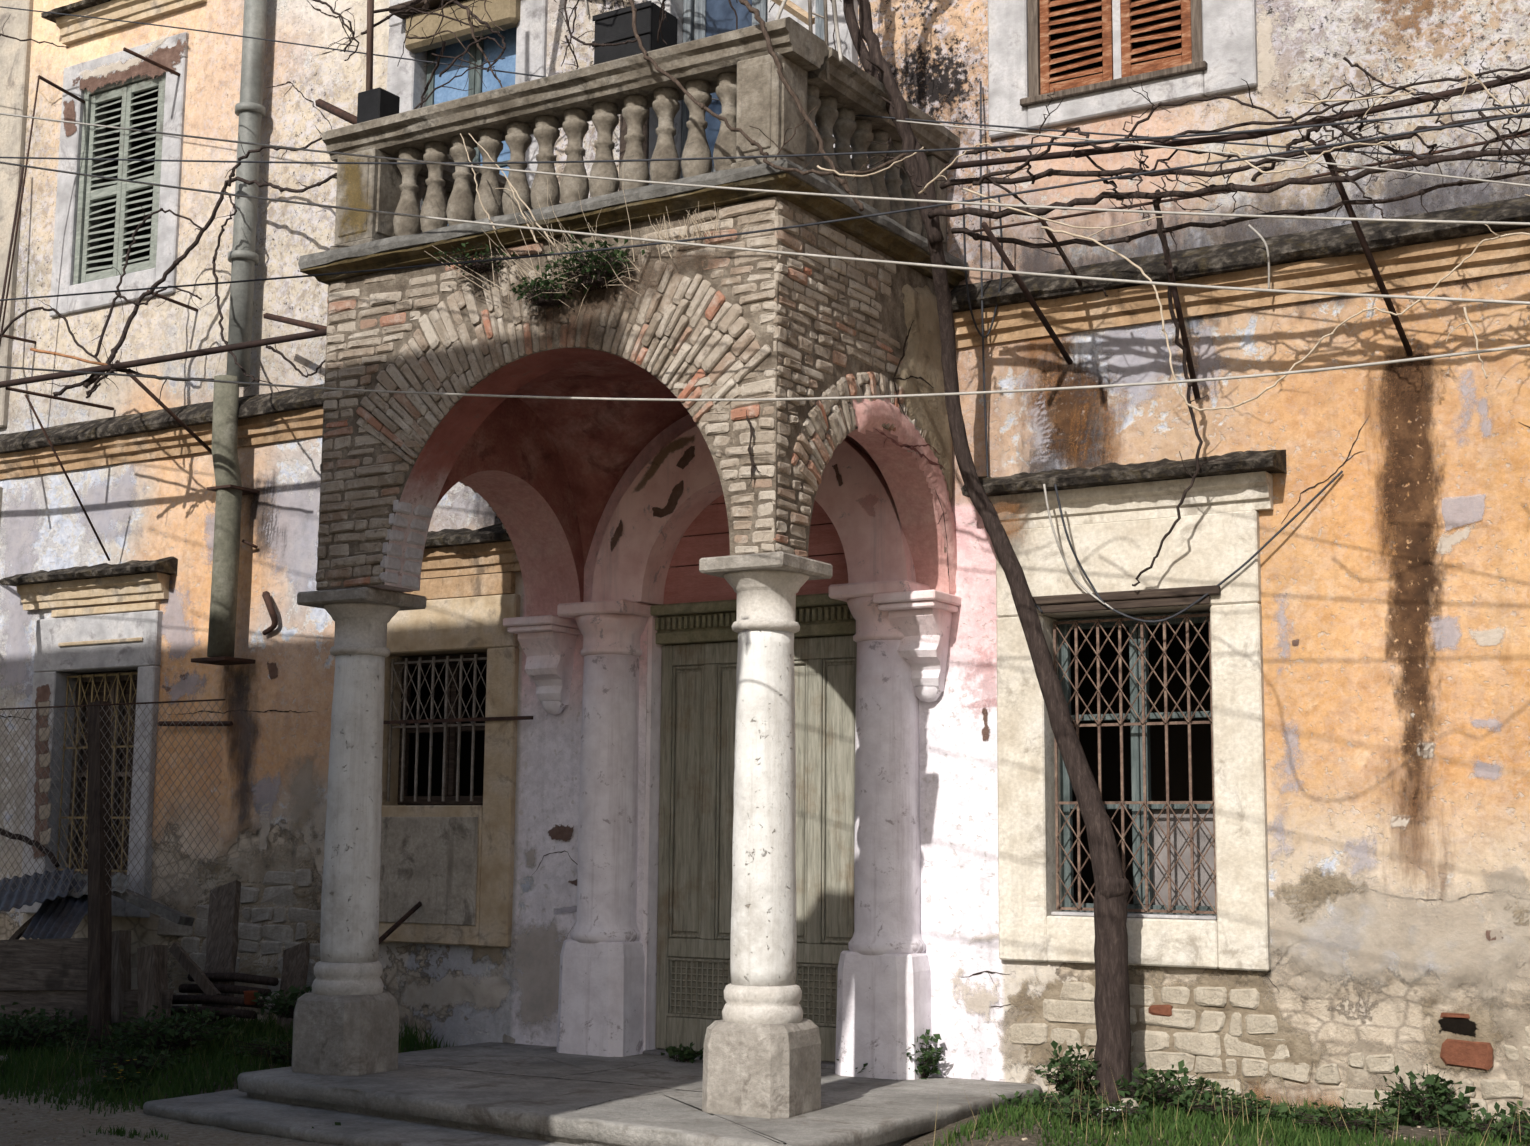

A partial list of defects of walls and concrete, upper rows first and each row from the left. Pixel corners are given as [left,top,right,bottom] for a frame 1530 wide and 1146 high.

peeling [1366,0,1446,52]
leakage [1029,359,1110,473]
flaking render [635,436,695,518]
flaking render [610,520,623,551]
peeling [1437,494,1485,554]
leakage [1380,346,1443,858]
flaking render [1431,616,1505,650]
leakage [225,665,258,822]
flaking render [1475,761,1501,779]
flaking render [548,824,574,842]
crack [1357,888,1523,906]